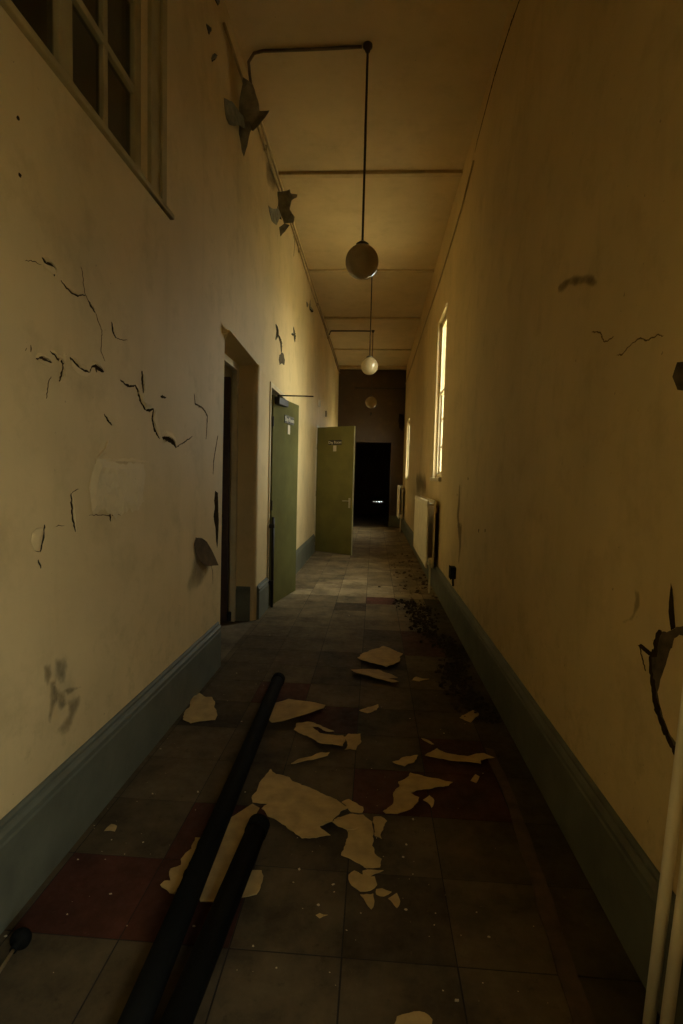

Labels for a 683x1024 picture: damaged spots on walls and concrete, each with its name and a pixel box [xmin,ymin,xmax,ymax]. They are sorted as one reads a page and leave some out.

peeling [224,77,269,156]
peeling [268,189,297,249]
crack [25,255,218,471]
crack [593,331,663,356]
peeling [638,586,683,755]